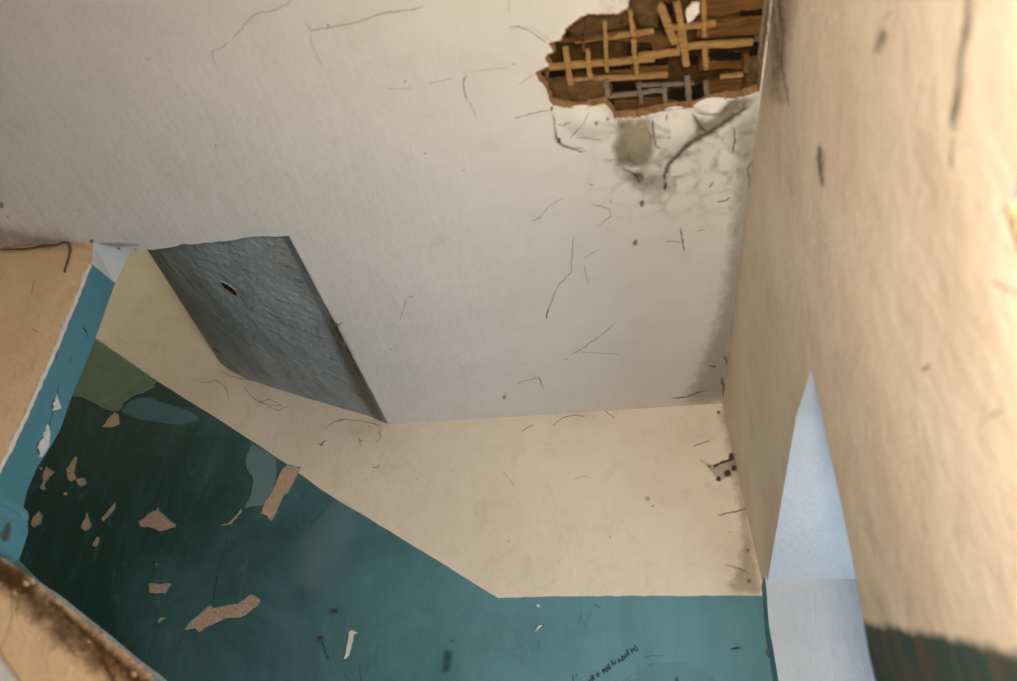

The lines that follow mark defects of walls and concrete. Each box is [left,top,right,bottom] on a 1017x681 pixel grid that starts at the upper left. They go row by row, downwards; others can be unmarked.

flaking render [536,0,771,119]
damp [615,121,659,165]
peeling [220,444,301,526]
peeling [30,511,43,528]
peeling [80,502,116,547]
peeling [138,508,176,532]
peeling [149,583,172,595]
damp [0,561,150,681]
peeling [184,594,260,633]
flaking render [87,629,152,677]
peeling [344,629,358,660]